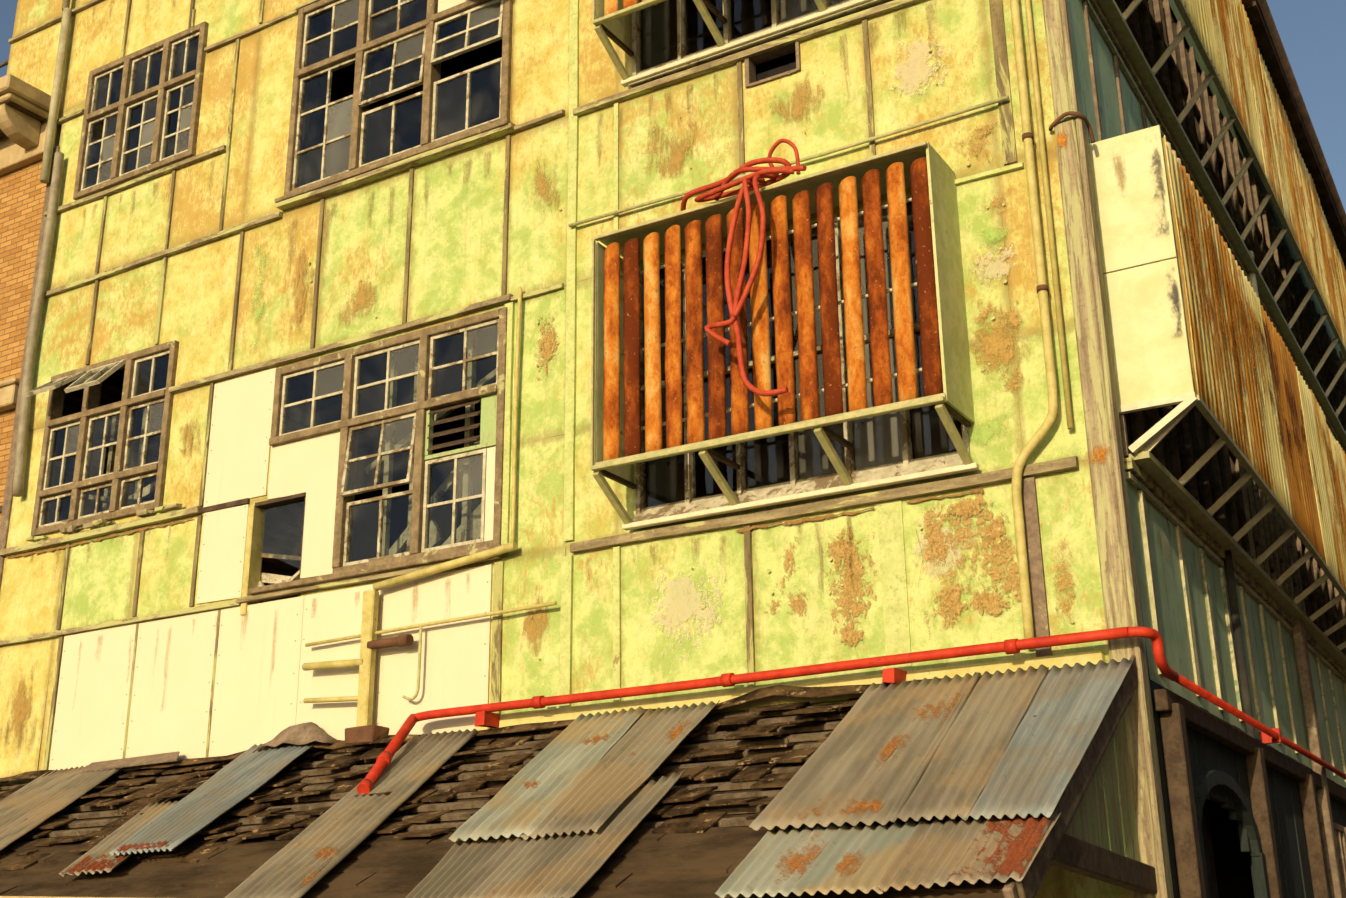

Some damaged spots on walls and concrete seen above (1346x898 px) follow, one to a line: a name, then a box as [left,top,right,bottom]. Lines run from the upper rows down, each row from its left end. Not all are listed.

peeling [891,35,954,97]
rust [1210,0,1290,156]
peeling [967,243,1017,286]
peeling [971,300,1029,392]
rust [1178,181,1346,533]
peeling [651,565,726,659]
peeling [823,522,877,650]
peeling [912,487,1021,637]
rust [61,840,168,876]
rust [946,814,1055,880]